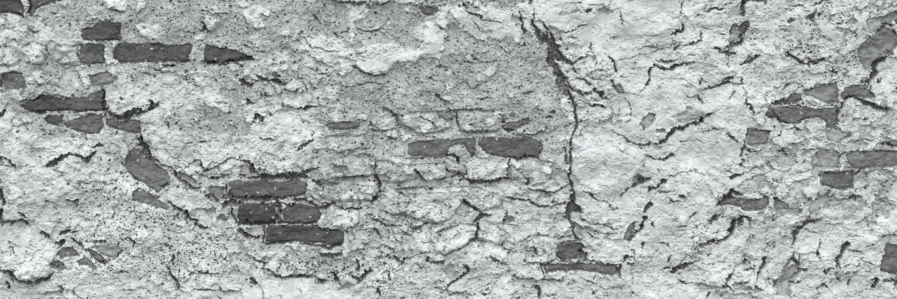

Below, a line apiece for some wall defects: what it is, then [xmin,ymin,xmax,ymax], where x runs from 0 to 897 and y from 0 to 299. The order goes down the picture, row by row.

crack [0,78,8,118]
crack [450,111,461,128]
crack [498,113,507,130]
crack [506,0,664,243]
crack [726,56,792,176]
spalling [0,0,659,299]
peeling [616,0,897,299]
crack [373,161,383,193]
crack [355,252,367,274]
crack [392,207,517,292]
crack [531,263,546,299]
crack [795,239,826,268]